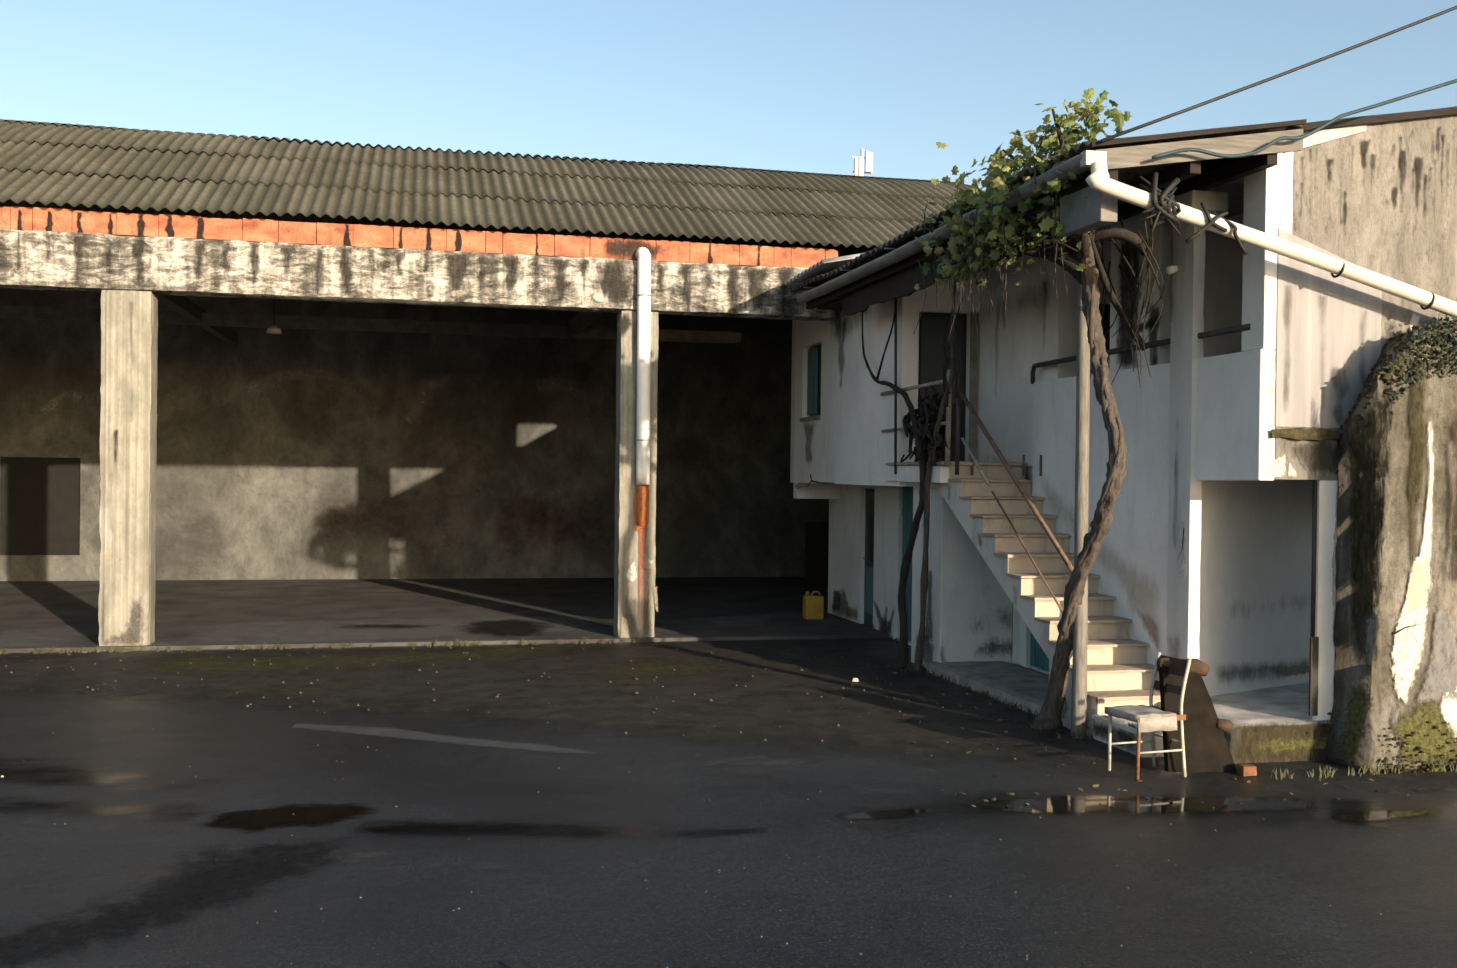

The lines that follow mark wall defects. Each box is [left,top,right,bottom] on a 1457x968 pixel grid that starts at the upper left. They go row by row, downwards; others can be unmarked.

damp [1361,141,1376,169]
damp [1393,128,1444,213]
damp [45,211,53,257]
damp [56,212,94,285]
damp [125,215,176,288]
damp [195,218,204,278]
damp [336,224,372,301]
damp [396,227,405,275]
damp [425,228,485,304]
damp [503,233,793,342]
damp [1408,361,1429,560]
rust [634,485,652,627]